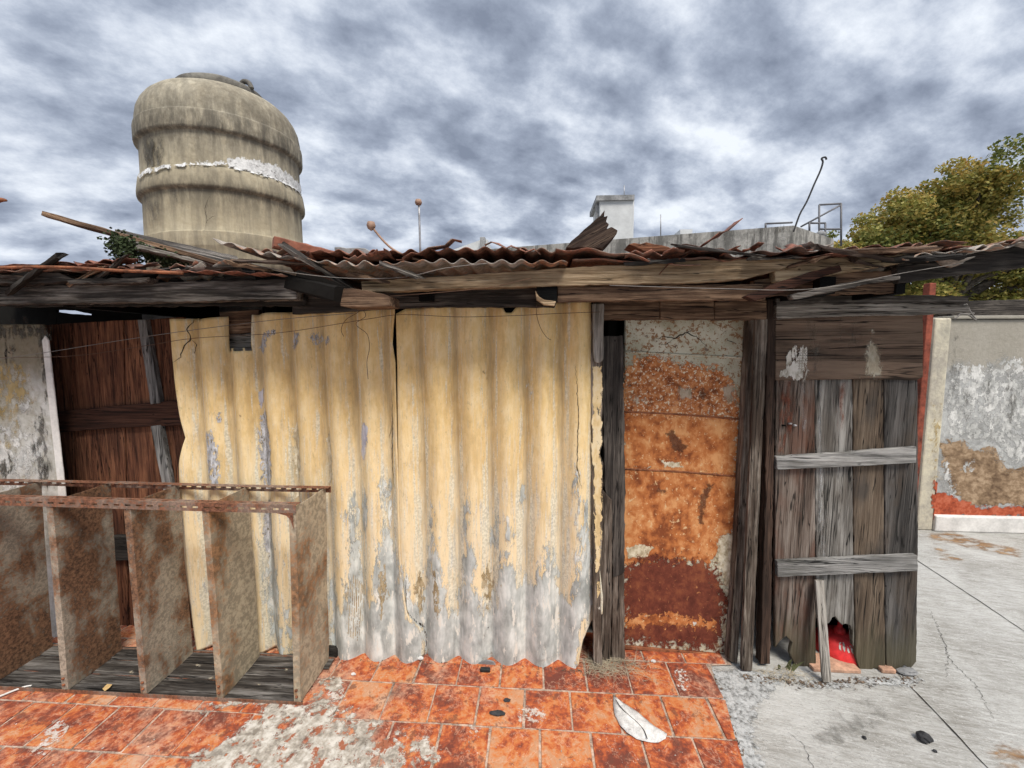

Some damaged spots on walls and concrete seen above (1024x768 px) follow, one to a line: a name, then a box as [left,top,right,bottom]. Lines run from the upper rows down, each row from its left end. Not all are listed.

flaking render [138,157,302,195]
peeling [779,345,809,381]
peeling [866,330,881,376]
peeling [0,397,37,491]
peeling [932,356,1024,507]
peeling [327,366,603,668]
rust [623,354,741,653]